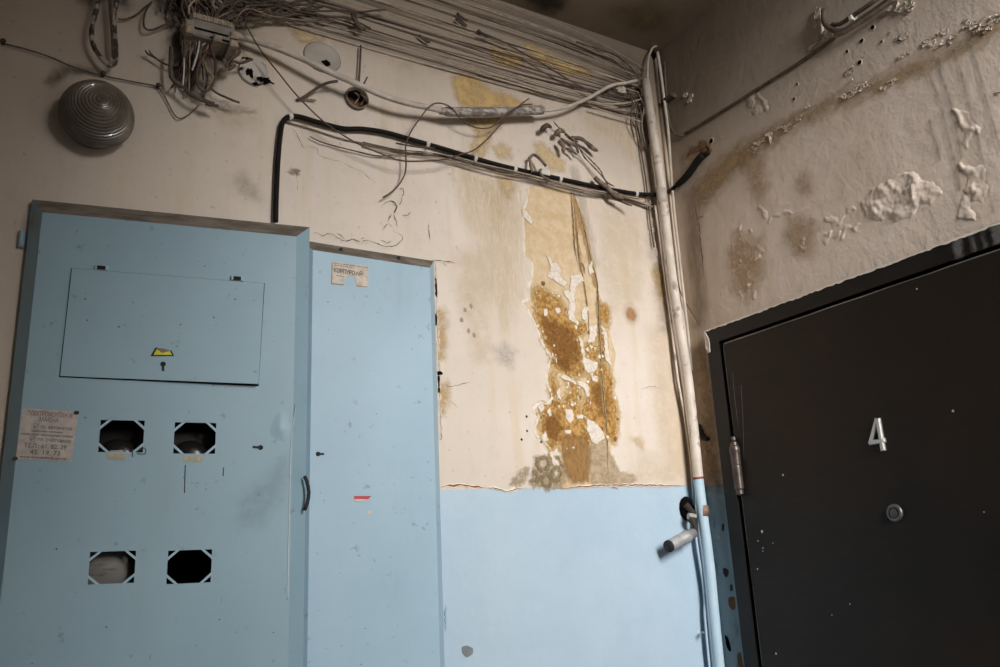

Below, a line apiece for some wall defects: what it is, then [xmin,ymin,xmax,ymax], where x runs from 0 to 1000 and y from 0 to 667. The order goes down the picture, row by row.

crack [293,128,456,266]
damp [453,75,526,156]
damp [697,59,961,205]
peeling [521,186,620,487]
mould [511,452,565,491]
damp [590,443,635,485]